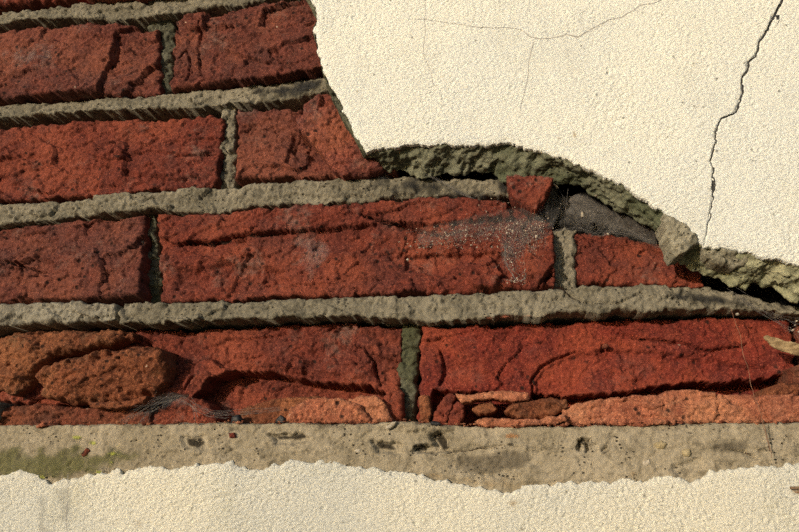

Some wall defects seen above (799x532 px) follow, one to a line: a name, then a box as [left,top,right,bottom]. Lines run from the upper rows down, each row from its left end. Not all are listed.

flaking render [306,0,799,304]
crack [705,0,783,237]
flaking render [0,329,799,493]